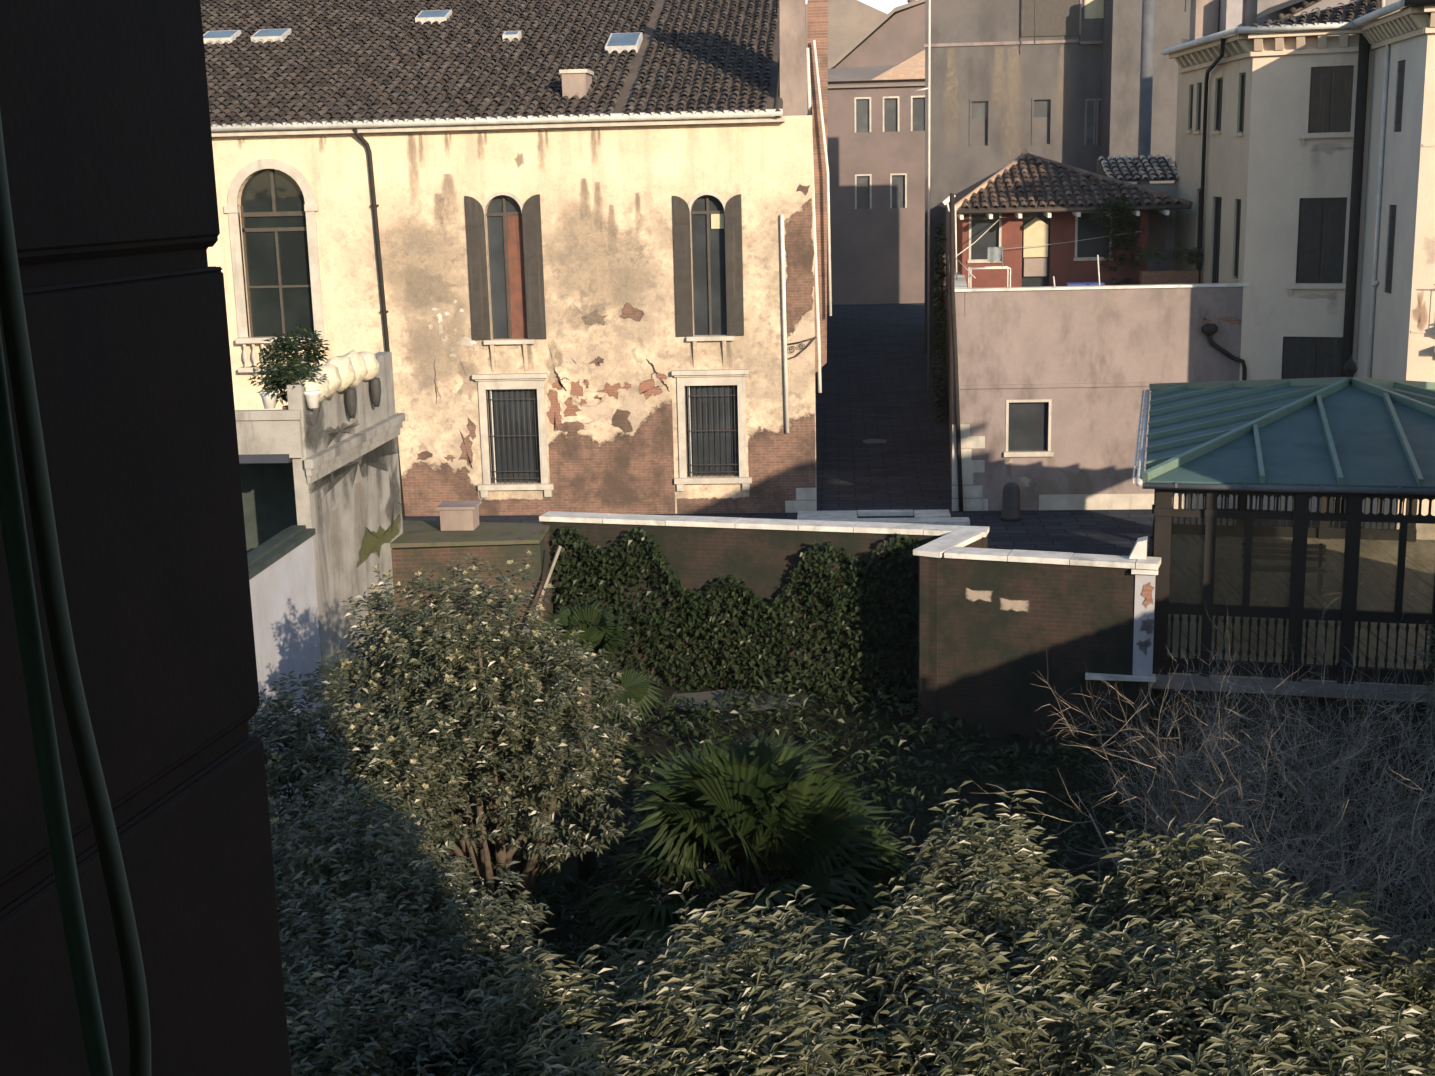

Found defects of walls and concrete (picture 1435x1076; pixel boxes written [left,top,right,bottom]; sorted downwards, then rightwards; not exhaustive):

leakage [582,178,613,218]
flaking render [581,303,644,325]
flaking render [784,184,814,376]
flaking render [402,349,816,516]